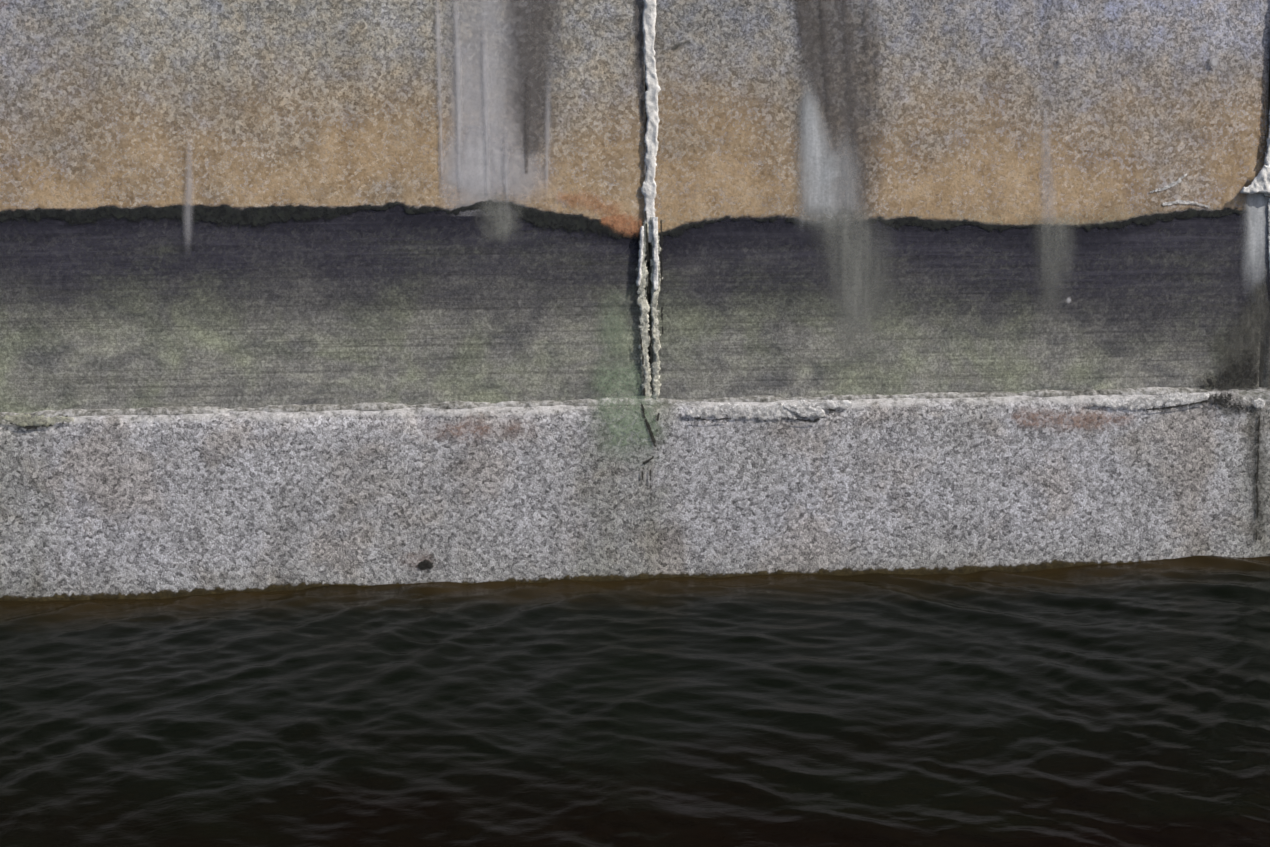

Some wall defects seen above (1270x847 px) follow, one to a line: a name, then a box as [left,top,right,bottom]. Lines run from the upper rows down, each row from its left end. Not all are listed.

damp [0,0,1270,414]
crack [1250,406,1263,540]